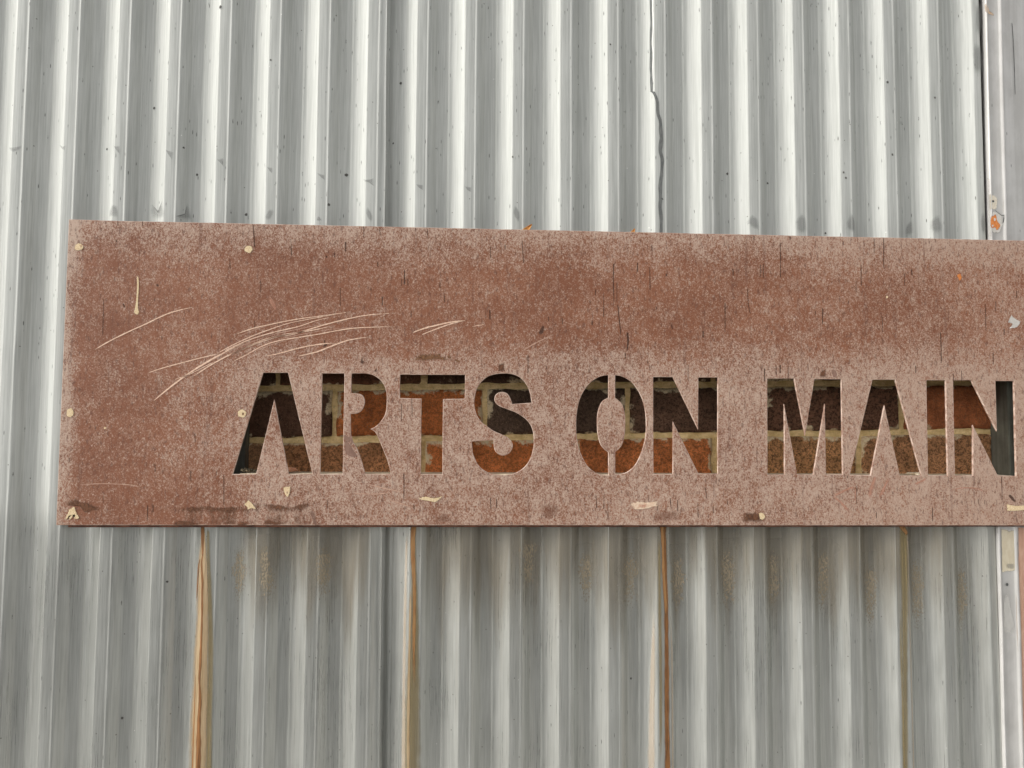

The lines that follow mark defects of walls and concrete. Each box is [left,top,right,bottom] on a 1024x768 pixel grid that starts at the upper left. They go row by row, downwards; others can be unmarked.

crack [650,0,664,233]
corrosion [191,527,212,768]
corrosion [405,527,418,768]
corrosion [658,527,670,768]